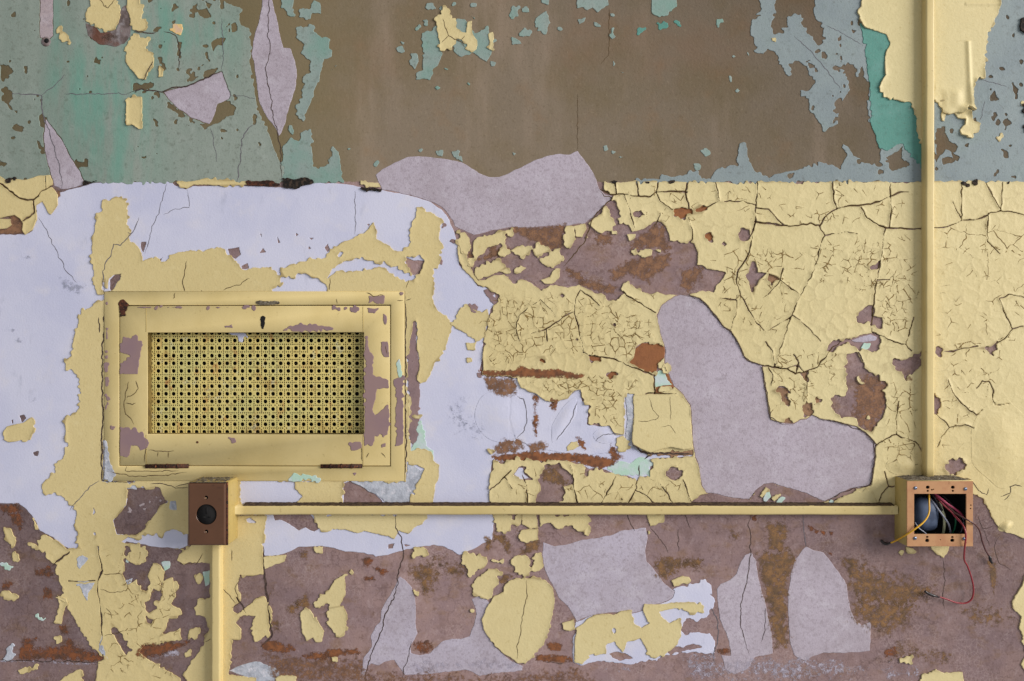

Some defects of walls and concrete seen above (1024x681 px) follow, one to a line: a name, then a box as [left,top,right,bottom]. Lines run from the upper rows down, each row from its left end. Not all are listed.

peeling [85,0,164,80]
flaking render [252,0,321,135]
peeling [396,2,497,90]
peeling [0,120,96,235]
peeling [0,148,1024,681]
rust [478,366,583,396]
rust [492,394,623,486]
crack [480,291,691,549]
crack [564,183,1024,501]
rust [19,625,104,662]
rust [136,640,188,658]
crack [365,515,404,677]